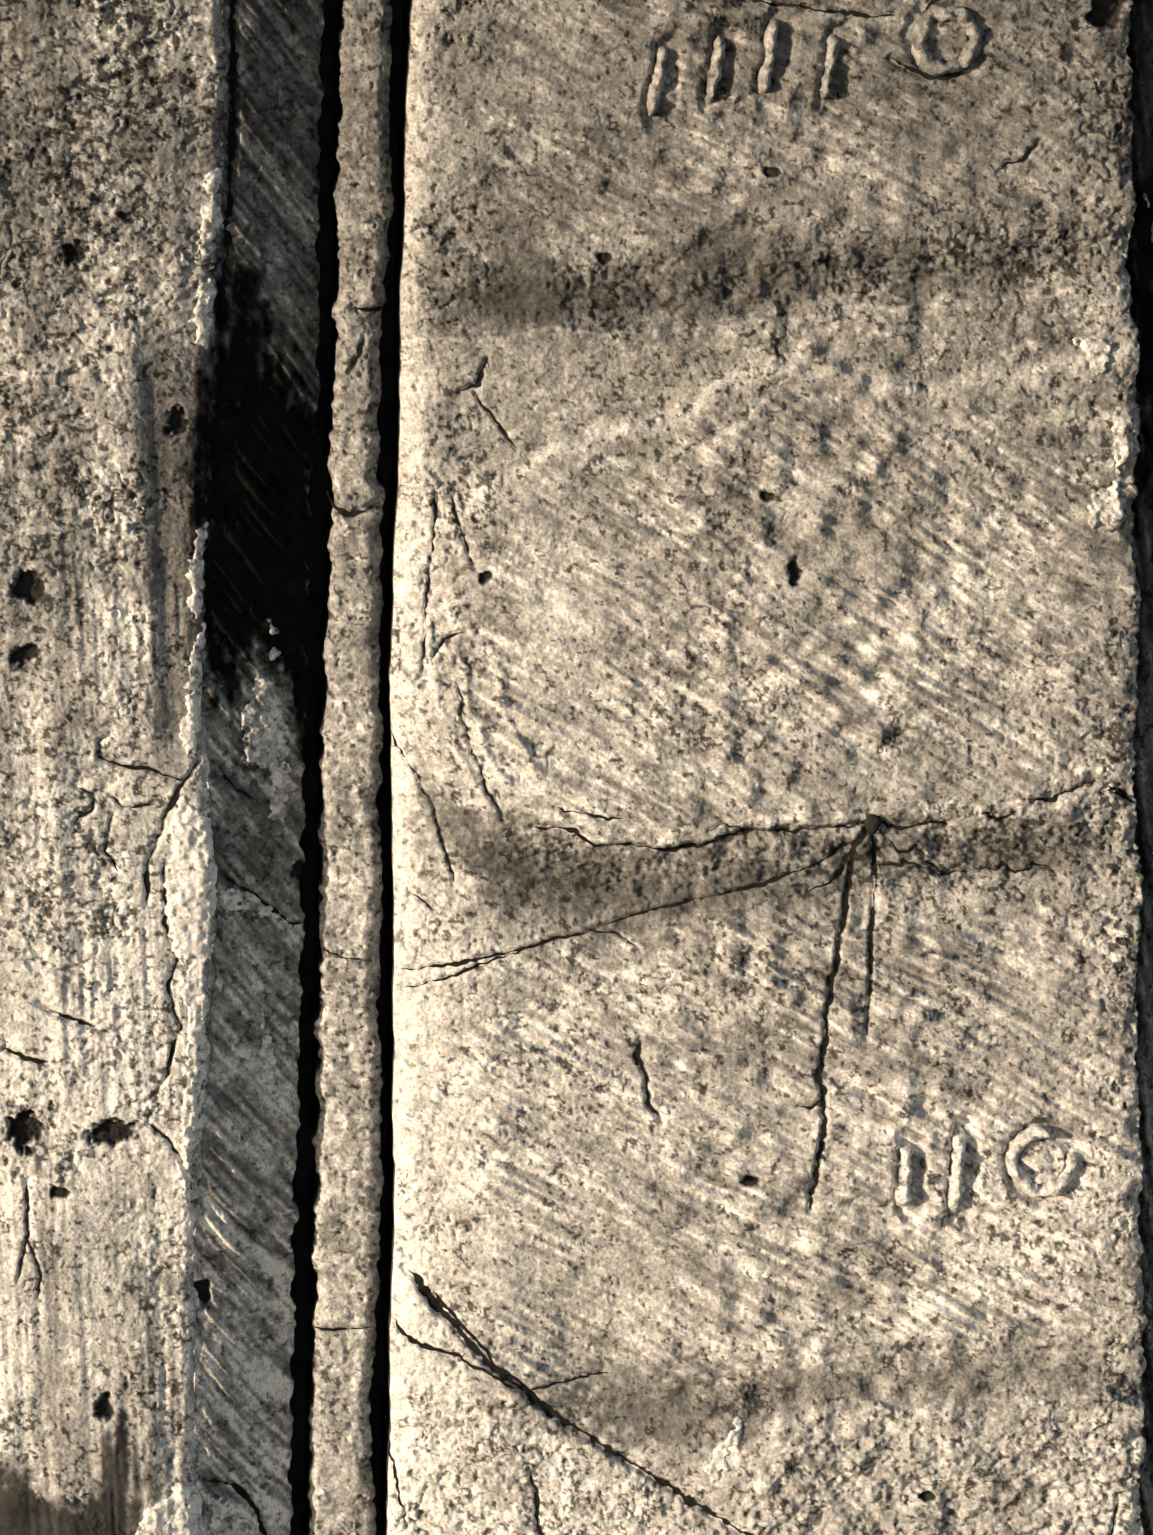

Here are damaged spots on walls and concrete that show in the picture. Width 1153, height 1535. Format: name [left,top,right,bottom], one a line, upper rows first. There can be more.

leakage [1129,179,1153,507]
leakage [178,262,315,761]
crack [222,491,1048,1211]
crack [981,780,1141,822]
leakage [0,1416,156,1535]
crack [312,1266,752,1535]
crack [1110,1499,1119,1535]